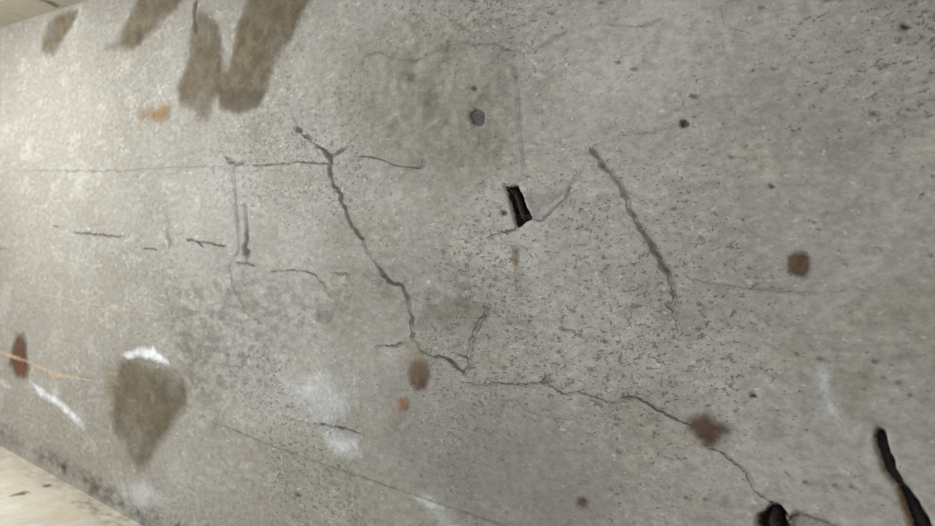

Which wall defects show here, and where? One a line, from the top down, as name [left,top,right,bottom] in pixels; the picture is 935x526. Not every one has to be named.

damp [121,0,178,47]
damp [178,0,308,110]
spalling [502,186,569,227]
crack [252,135,424,347]
crack [589,147,678,332]
corrosion [787,252,808,276]
corrosion [10,337,28,376]
corrosion [408,359,428,389]
damp [114,347,184,463]
crack [314,423,361,434]
crack [432,304,777,506]
corrosion [691,417,723,444]